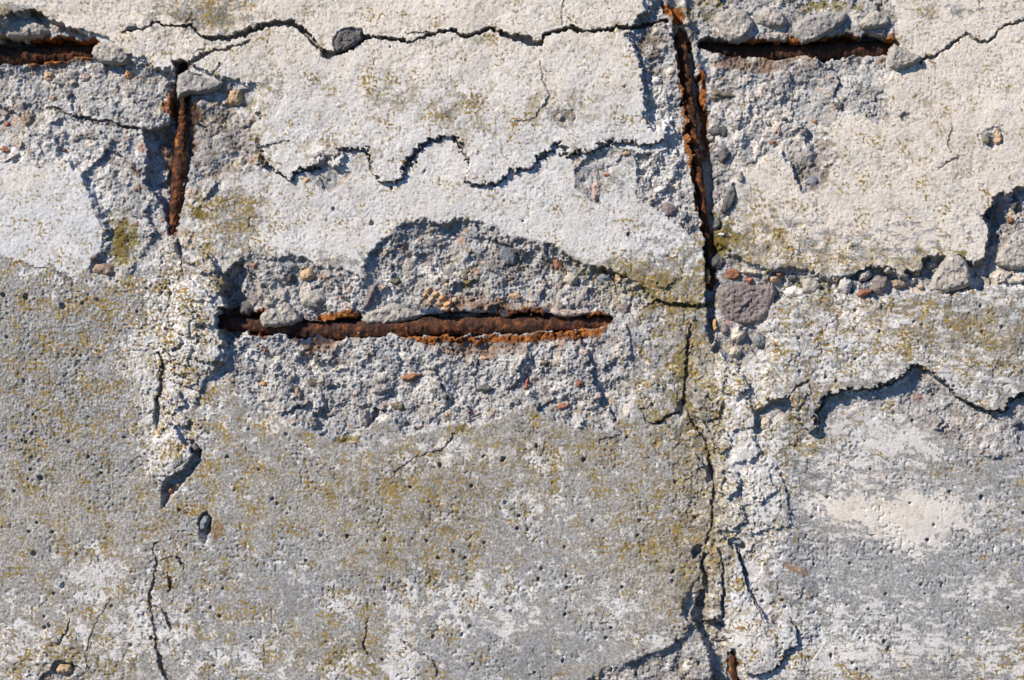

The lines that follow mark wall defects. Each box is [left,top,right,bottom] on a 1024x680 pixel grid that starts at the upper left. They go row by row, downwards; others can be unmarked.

corrosion [28,35,100,68]
crack [122,0,669,124]
corrosion [662,4,686,27]
crack [919,19,1024,69]
crack [257,135,666,188]
corrosion [677,60,712,229]
flaking render [0,0,1024,464]
corrosion [405,310,614,347]
crack [637,299,721,545]
crack [791,364,1024,428]
peeling [797,471,1024,564]
peeling [860,595,888,621]